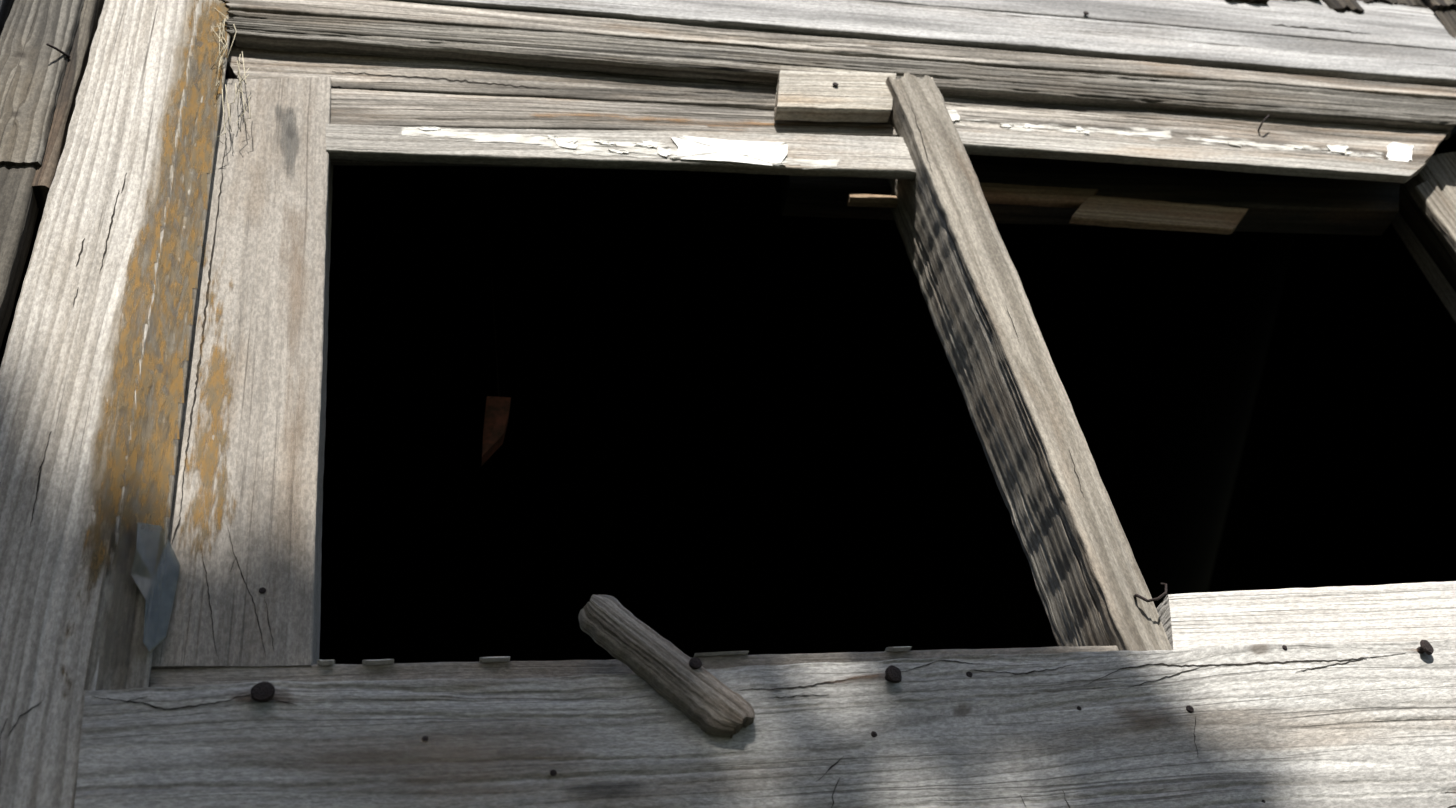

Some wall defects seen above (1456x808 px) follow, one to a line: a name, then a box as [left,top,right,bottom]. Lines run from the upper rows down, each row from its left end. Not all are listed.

peeling [401,126,840,169]
peeling [948,110,1414,162]
crack [171,138,274,656]
crack [92,694,296,710]
crack [740,678,854,698]
crack [902,653,1404,687]
crack [817,757,843,808]